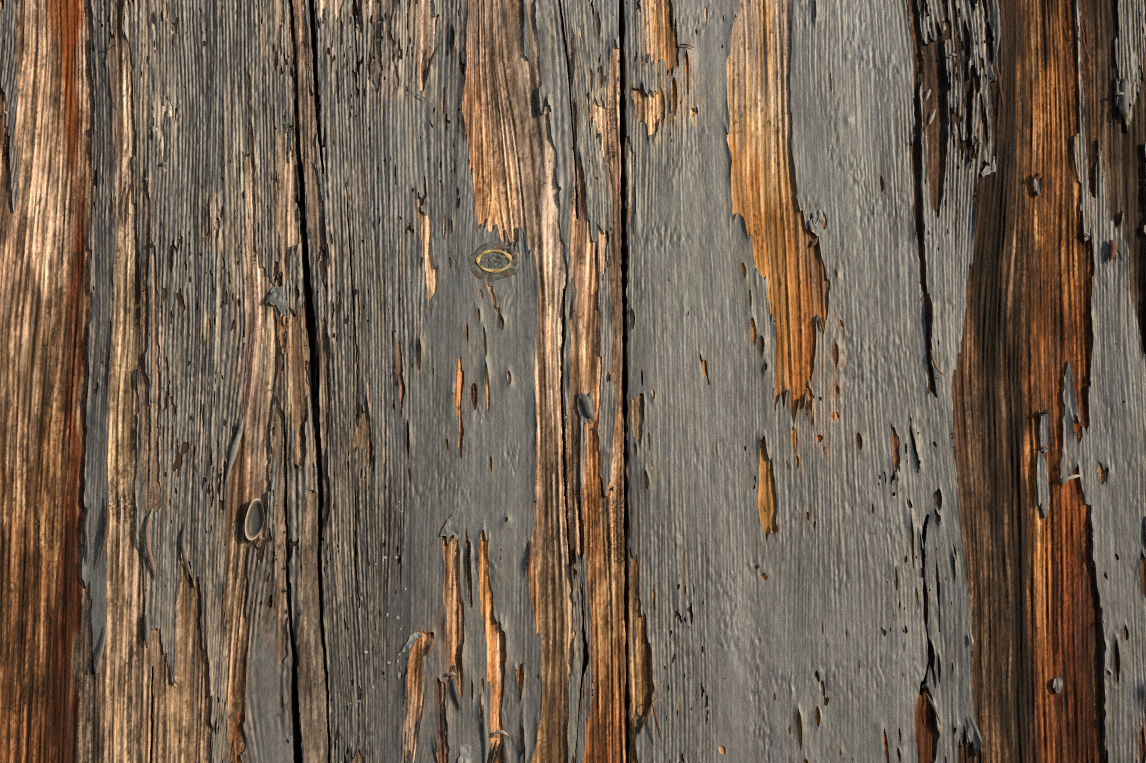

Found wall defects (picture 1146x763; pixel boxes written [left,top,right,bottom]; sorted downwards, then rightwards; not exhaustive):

crack [352,0,360,75]
peeling [725,0,843,469]
crack [284,0,358,763]
peeling [0,0,698,763]
peeling [906,0,1146,763]
peeling [758,436,780,541]
peeling [891,425,919,479]
crack [353,491,361,608]
peeling [788,711,808,763]
peeling [815,671,829,726]
peeling [884,729,900,763]